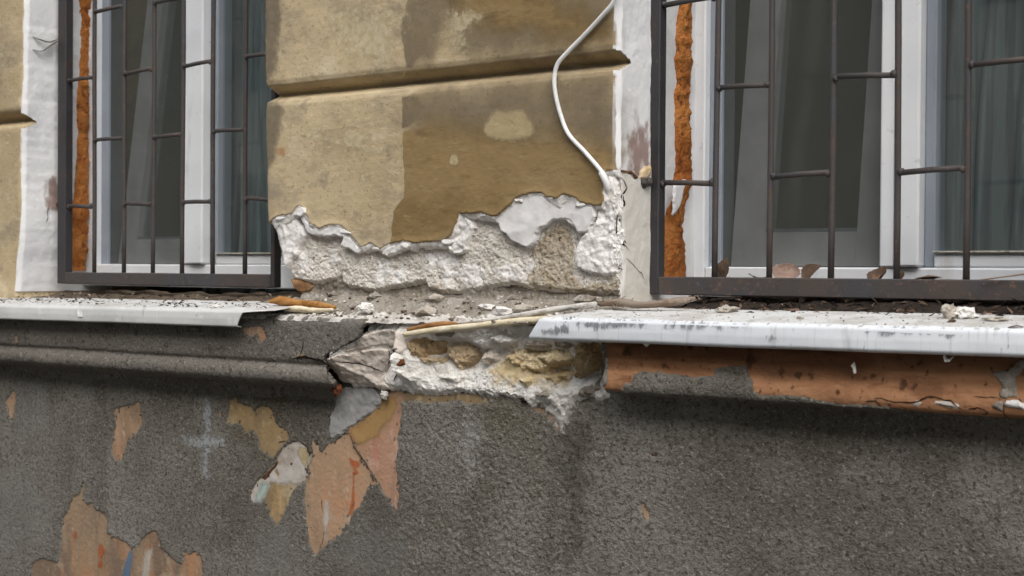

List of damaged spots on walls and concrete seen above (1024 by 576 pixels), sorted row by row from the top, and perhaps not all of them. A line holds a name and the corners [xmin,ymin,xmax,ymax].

flaking render [272,165,659,317]
peeling [112,402,143,461]
peeling [218,329,488,554]
peeling [604,342,1024,418]
crack [865,396,1023,420]
peeling [31,483,203,576]